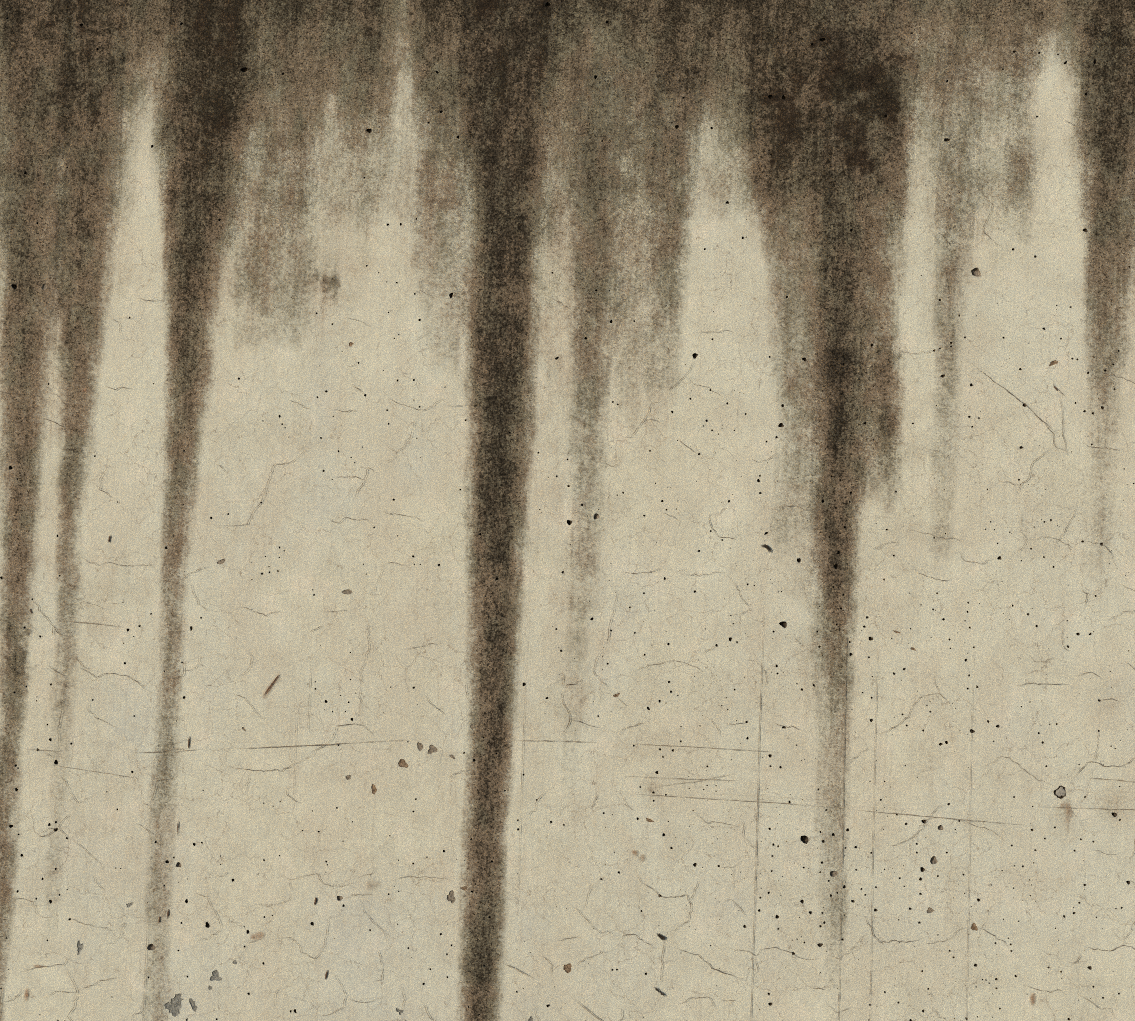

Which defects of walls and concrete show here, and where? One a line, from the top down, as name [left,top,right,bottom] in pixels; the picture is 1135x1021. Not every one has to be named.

damp [322,274,339,293]
damp [878,404,896,437]